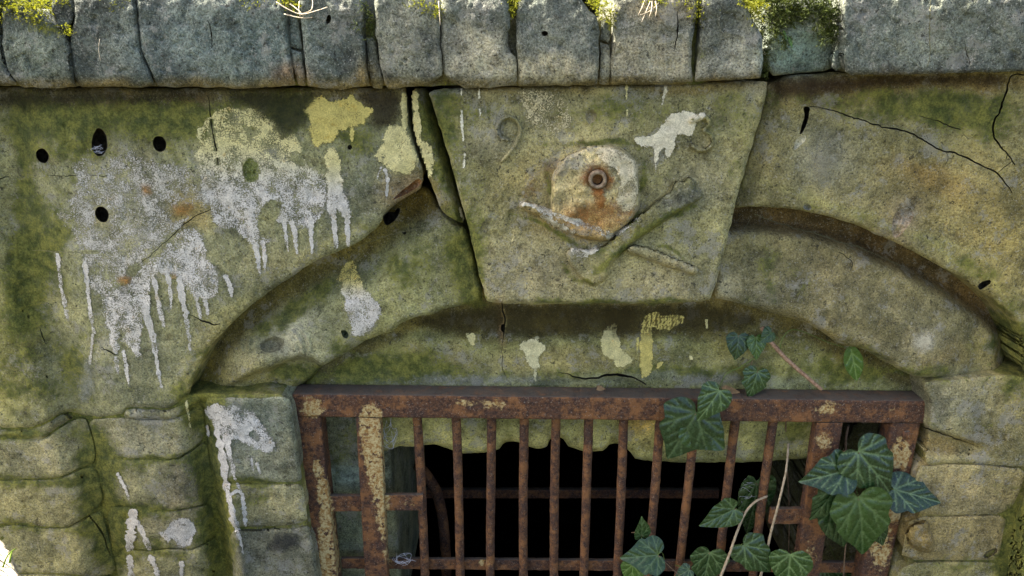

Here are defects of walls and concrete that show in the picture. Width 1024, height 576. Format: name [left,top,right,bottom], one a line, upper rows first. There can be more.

crack [809,73,1024,193]
leakage [56,89,435,402]
corrosion [567,168,630,226]
crack [500,303,508,380]
crack [560,372,646,385]
leakage [205,403,276,554]